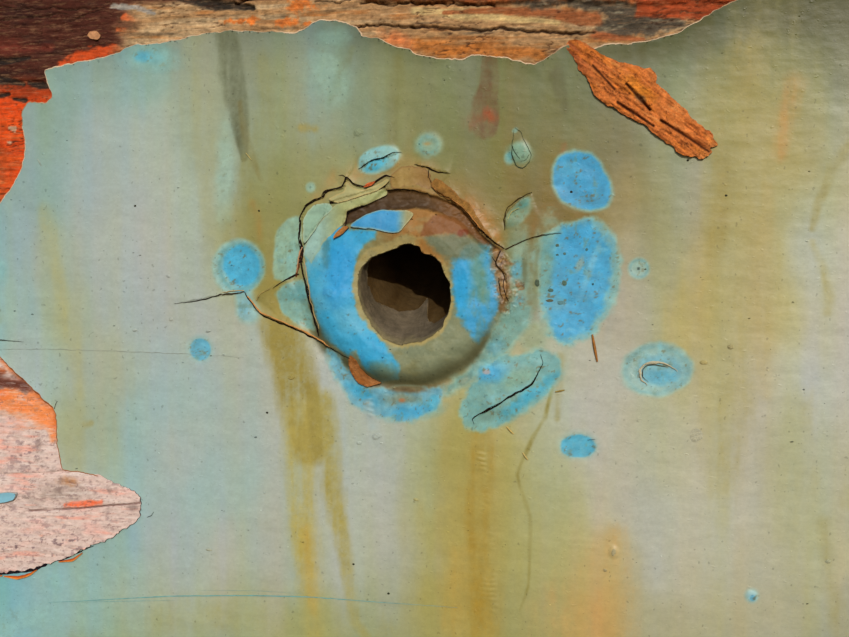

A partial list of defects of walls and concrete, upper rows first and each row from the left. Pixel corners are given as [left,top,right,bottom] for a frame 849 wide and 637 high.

peeling [0,357,142,580]
peeling [209,104,241,248]
corrosion [253,269,362,607]
peeling [270,179,413,334]
corrosion [348,355,382,387]
crack [175,152,558,359]
peeling [0,0,737,203]
peeling [322,211,566,426]
crack [472,357,543,423]
crack [511,129,531,168]